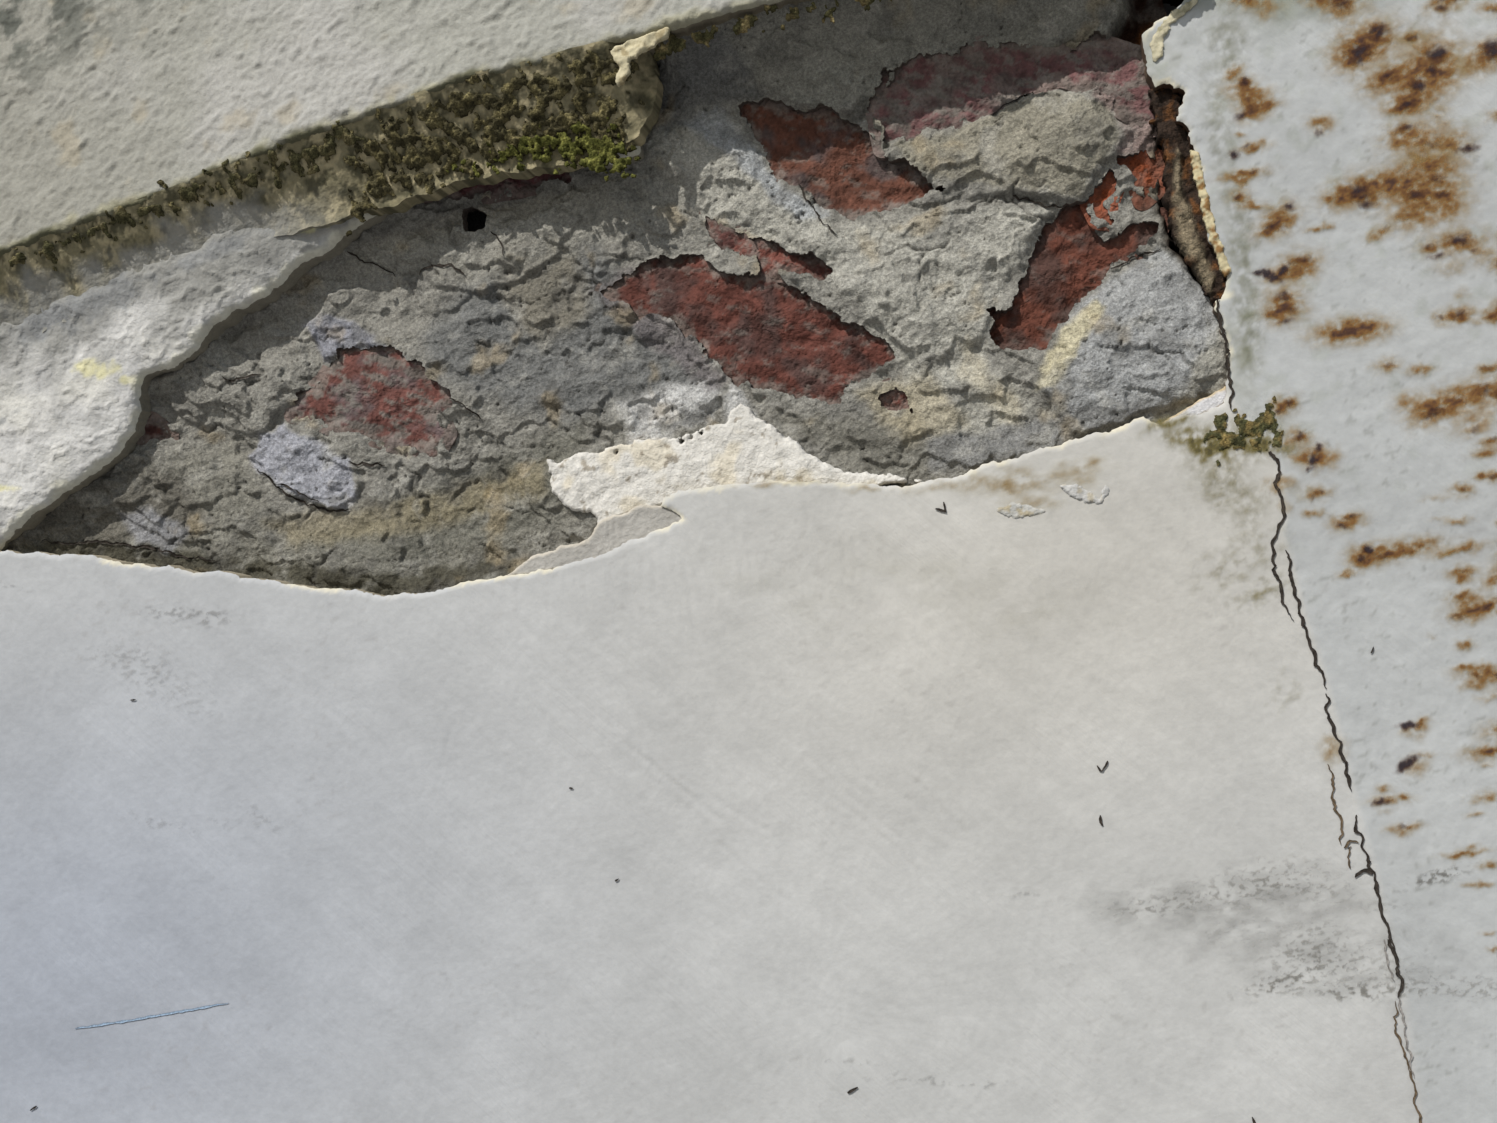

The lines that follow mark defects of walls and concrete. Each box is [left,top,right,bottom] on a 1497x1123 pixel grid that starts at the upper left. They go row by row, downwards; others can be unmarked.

rust [1225,67,1332,237]
rust [1311,0,1497,267]
spalling [5,0,1231,596]
crack [1216,296,1235,409]
rust [1253,255,1316,324]
rust [1317,318,1388,343]
rust [1442,306,1497,323]
rust [1286,431,1338,471]
rust [1399,364,1497,492]
rust [1340,539,1497,621]
rust [1456,641,1497,689]
crack [1268,451,1422,1123]